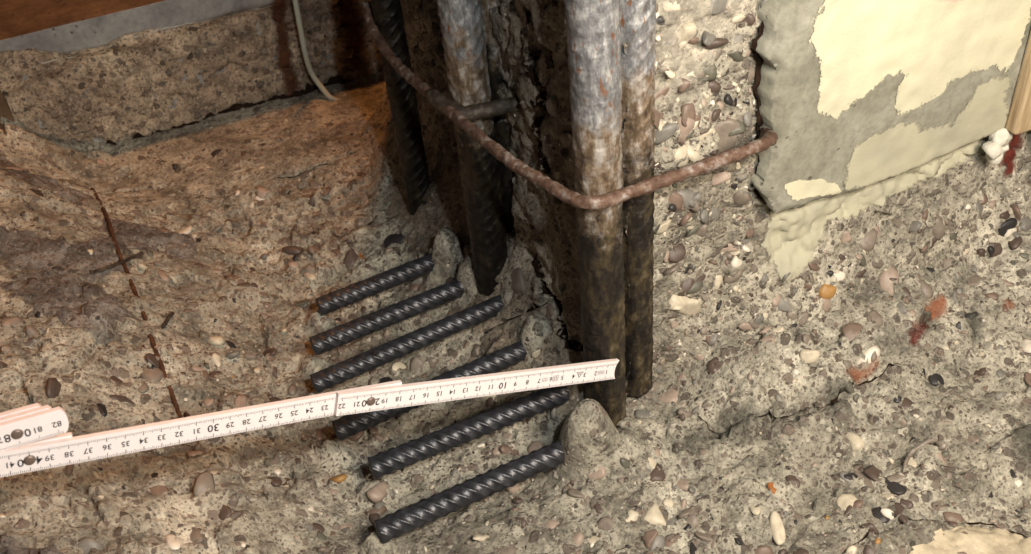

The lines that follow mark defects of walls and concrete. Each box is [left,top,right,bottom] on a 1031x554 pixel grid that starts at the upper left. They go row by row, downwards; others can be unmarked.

rust [272,0,298,97]
crack [106,74,356,145]
spalling [564,0,1031,425]
spalling [331,404,424,441]
spalling [367,385,570,479]
crack [698,363,902,435]